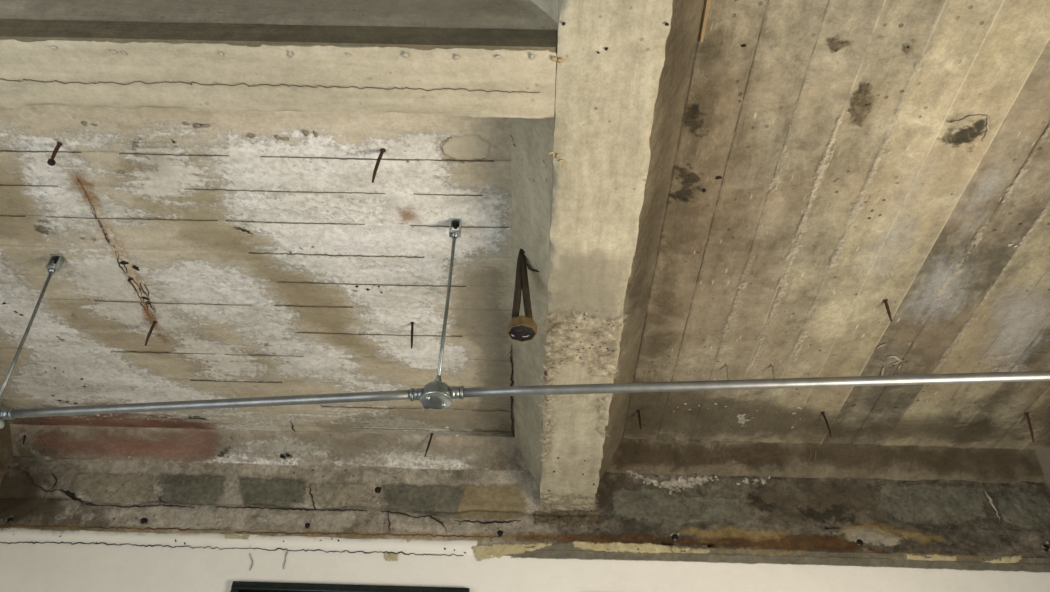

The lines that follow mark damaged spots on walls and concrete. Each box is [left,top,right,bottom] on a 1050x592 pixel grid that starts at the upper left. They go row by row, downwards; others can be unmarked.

leakage [121,161,159,180]
leakage [943,115,990,149]
leakage [137,185,371,353]
crack [0,466,464,570]